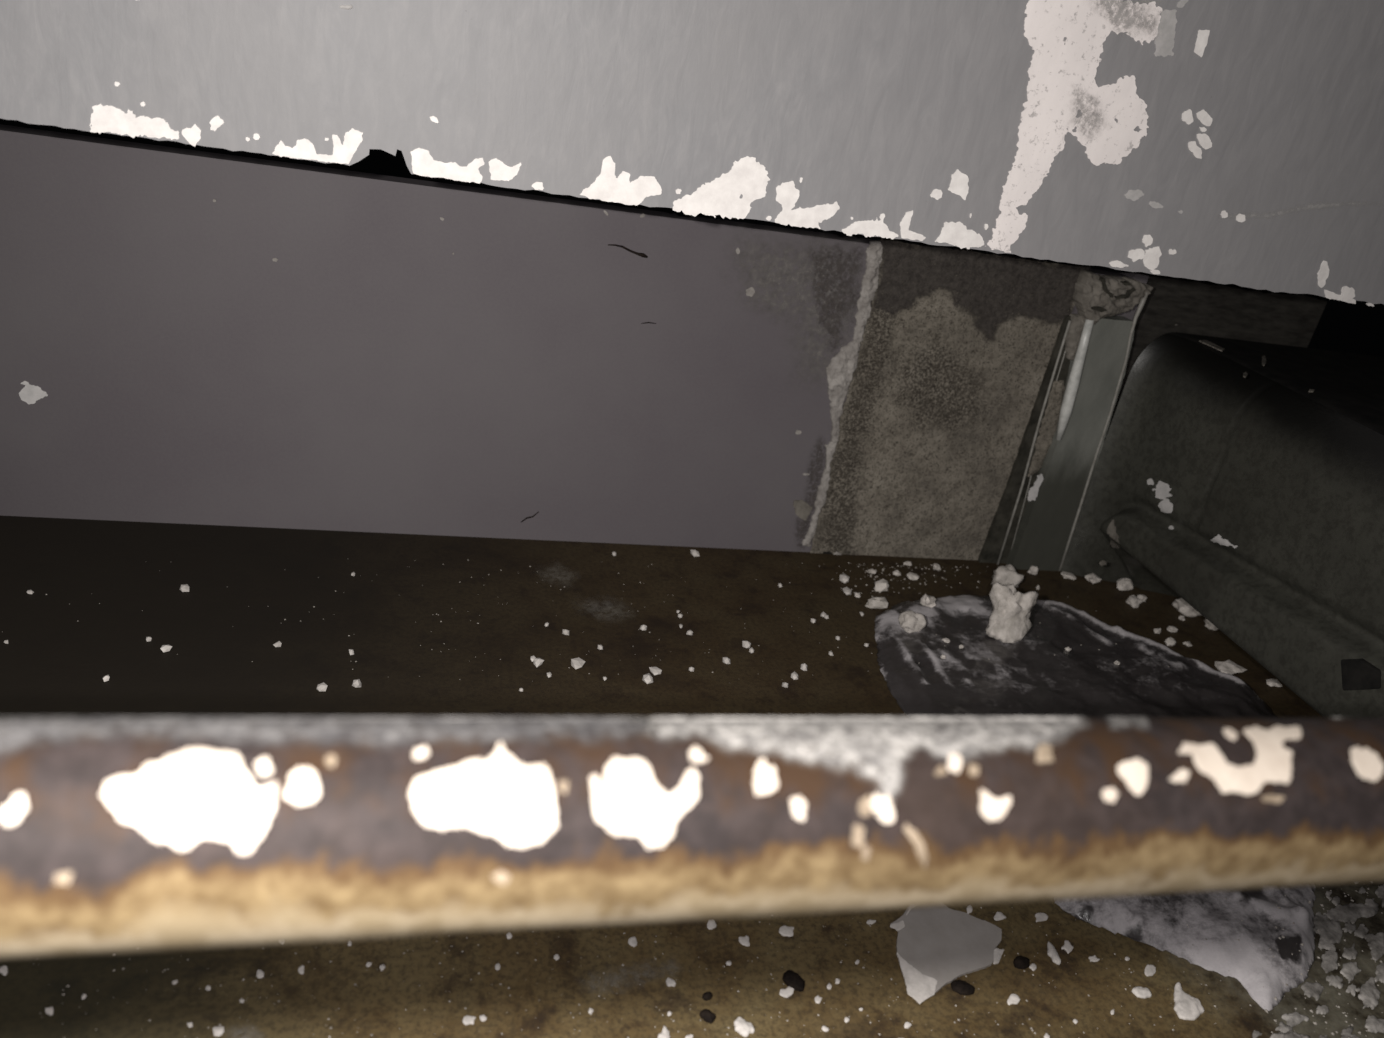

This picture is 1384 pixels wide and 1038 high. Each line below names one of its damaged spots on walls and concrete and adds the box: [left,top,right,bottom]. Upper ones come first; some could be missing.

peeling [89,101,224,146]
peeling [272,128,363,164]
peeling [410,148,522,184]
spalling [580,0,1189,566]
leakage [815,237,1090,340]
peeling [101,748,336,854]
peeling [410,742,568,847]
peeling [590,746,709,849]
peeling [934,753,1011,821]
peeling [1102,758,1149,803]
peeling [1169,725,1302,803]
peeling [1350,746,1384,782]